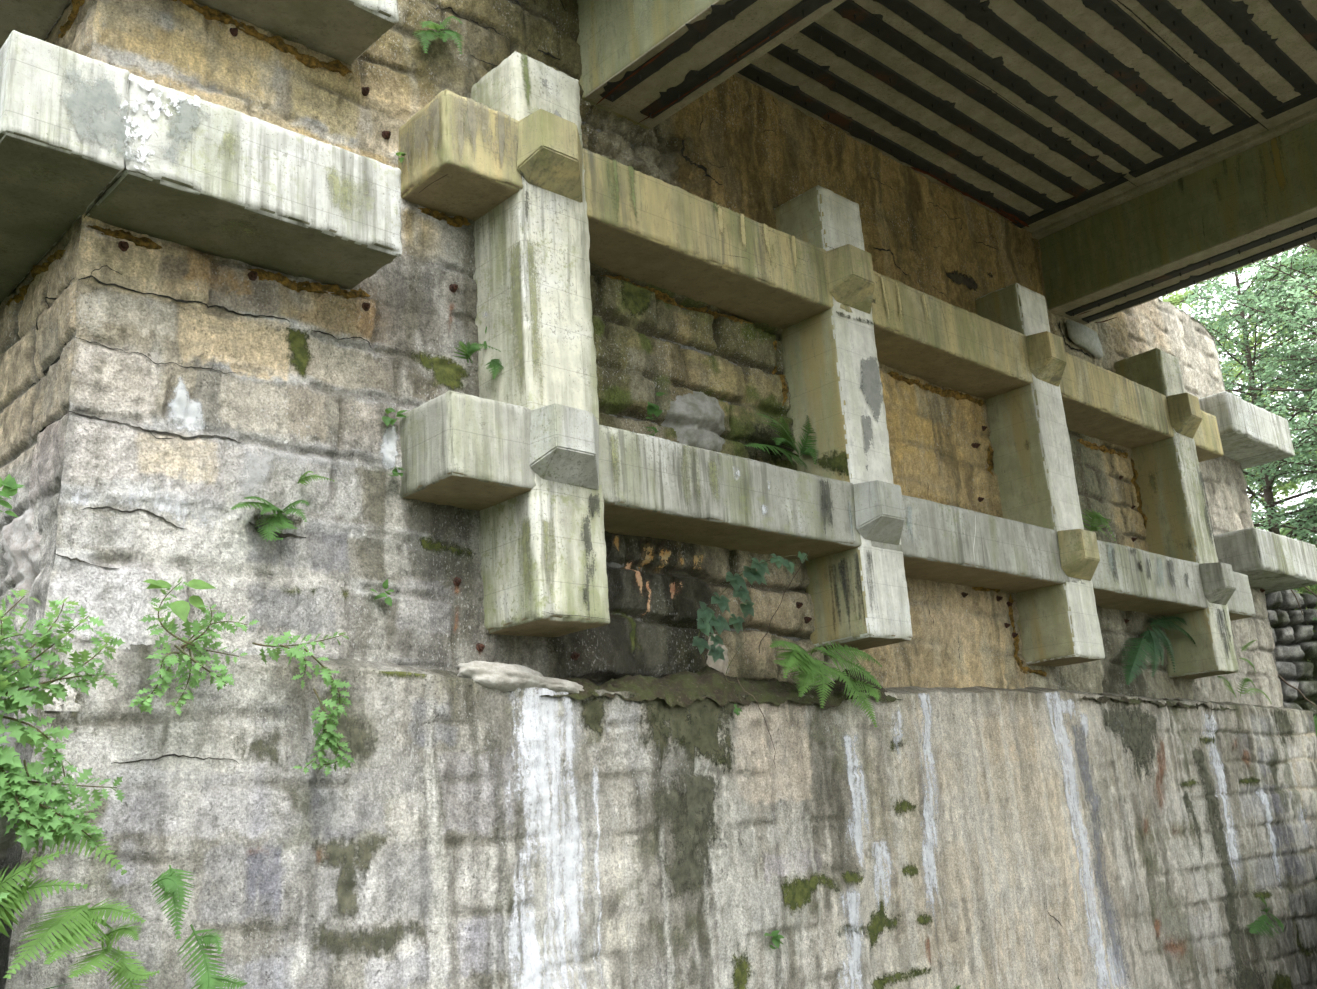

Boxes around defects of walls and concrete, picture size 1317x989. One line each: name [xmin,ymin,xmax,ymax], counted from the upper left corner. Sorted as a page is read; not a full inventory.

crack [429,5,507,69]
crack [83,506,185,529]
crack [39,411,241,443]
crack [30,265,370,387]
crack [111,754,238,764]
damp [508,688,611,989]
damp [628,692,748,900]
damp [840,735,892,989]
damp [918,693,938,926]
damp [1046,691,1128,989]
damp [1102,699,1158,780]
damp [1184,713,1266,989]